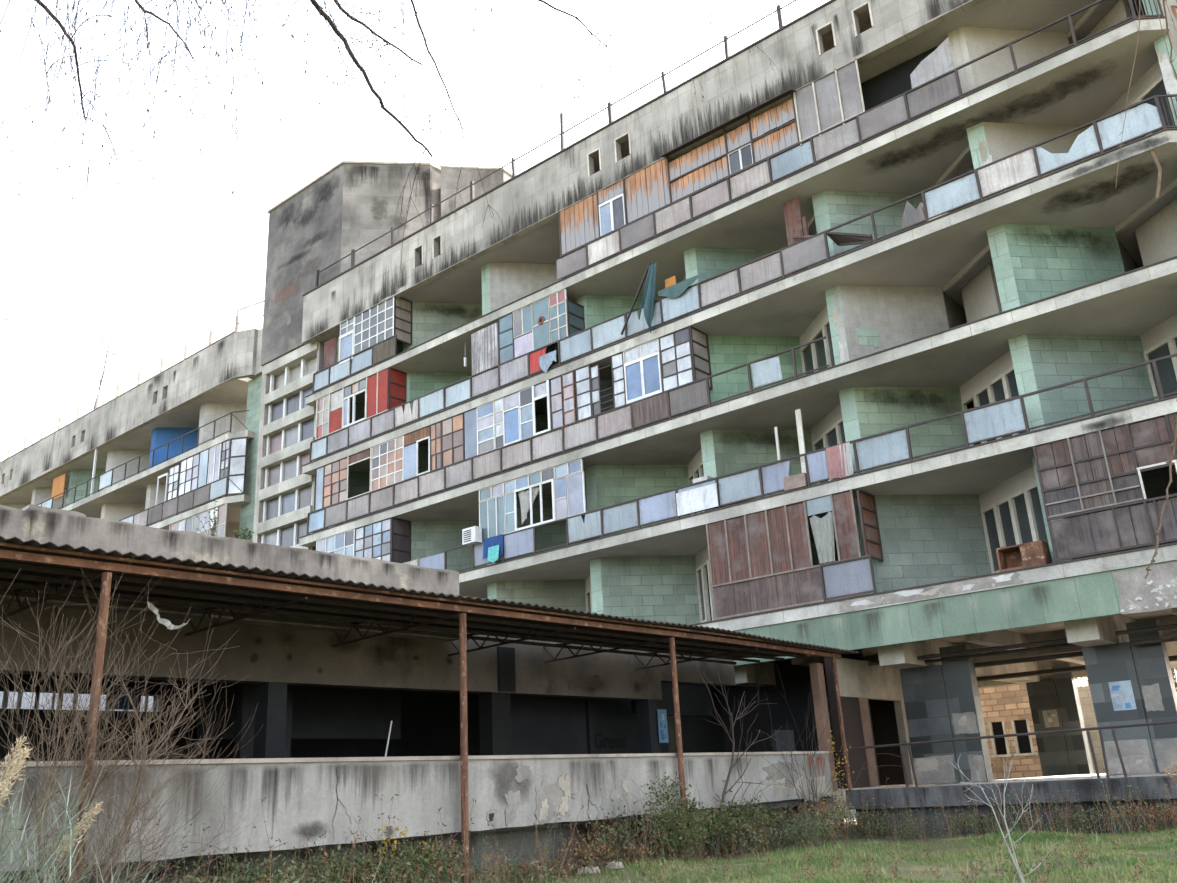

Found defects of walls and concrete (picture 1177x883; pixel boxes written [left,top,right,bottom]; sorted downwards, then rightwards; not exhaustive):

leakage [981,69,1100,122]
leakage [616,68,820,181]
leakage [880,125,964,167]
leakage [350,166,432,213]
leakage [490,178,603,246]
leakage [1061,166,1153,202]
leakage [341,243,476,321]
spalling [1112,562,1177,614]
leakage [0,775,39,820]
leakage [264,767,295,796]
leakage [361,765,383,792]
peeling [486,764,571,826]